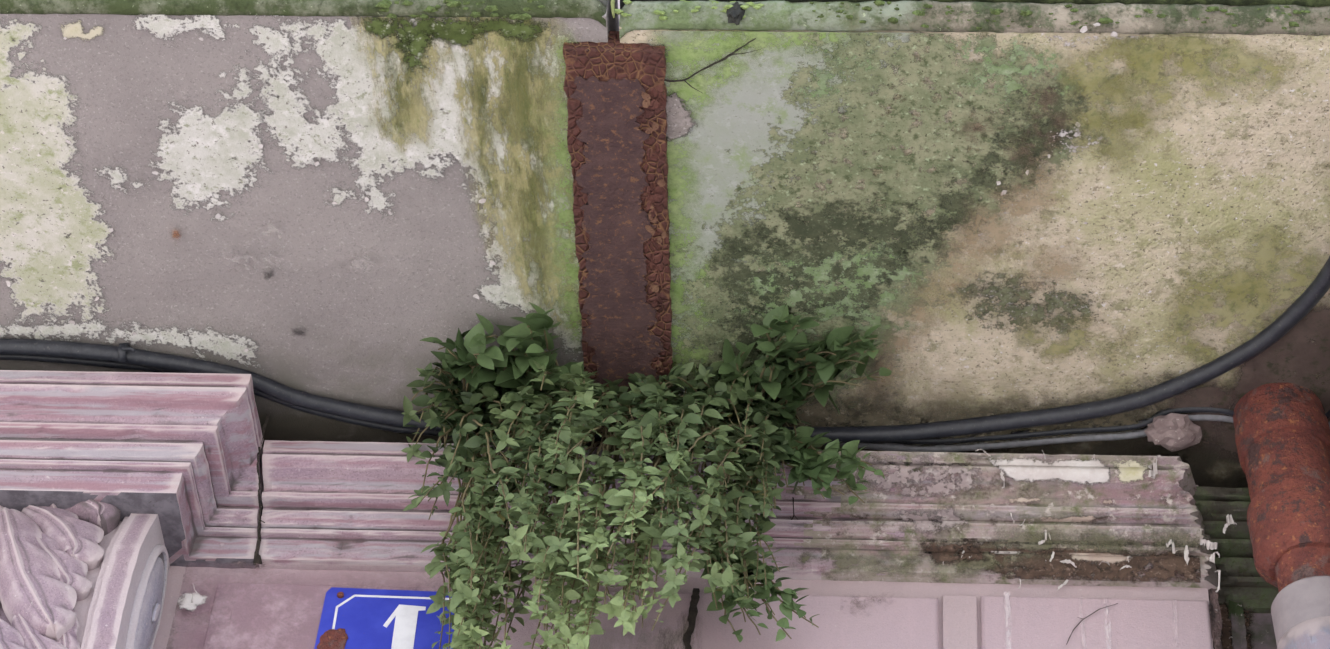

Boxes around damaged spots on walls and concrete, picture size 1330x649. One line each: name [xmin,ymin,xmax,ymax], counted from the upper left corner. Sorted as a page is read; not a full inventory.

peeling [0,14,583,370]
leakage [472,75,489,175]
leakage [505,19,582,341]
leakage [659,31,1330,460]
crack [253,414,270,565]
crack [683,588,700,649]
spalling [841,449,1253,649]